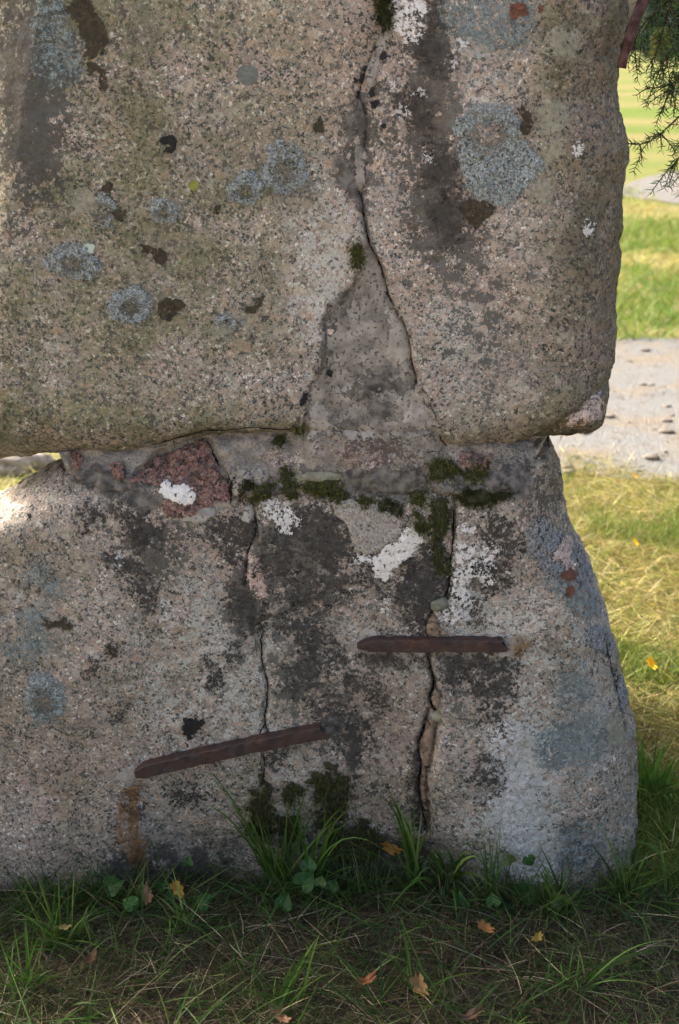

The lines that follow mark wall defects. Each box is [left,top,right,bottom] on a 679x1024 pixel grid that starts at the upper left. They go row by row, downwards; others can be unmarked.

crack [341,46,375,148]
water stain [324,0,497,255]
crack [361,200,391,301]
water stain [40,616,74,632]
water stain [78,640,122,684]
water stain [108,701,129,728]
crack [251,624,268,783]
water stain [197,500,530,807]
crack [418,507,455,832]
water stain [161,775,219,811]